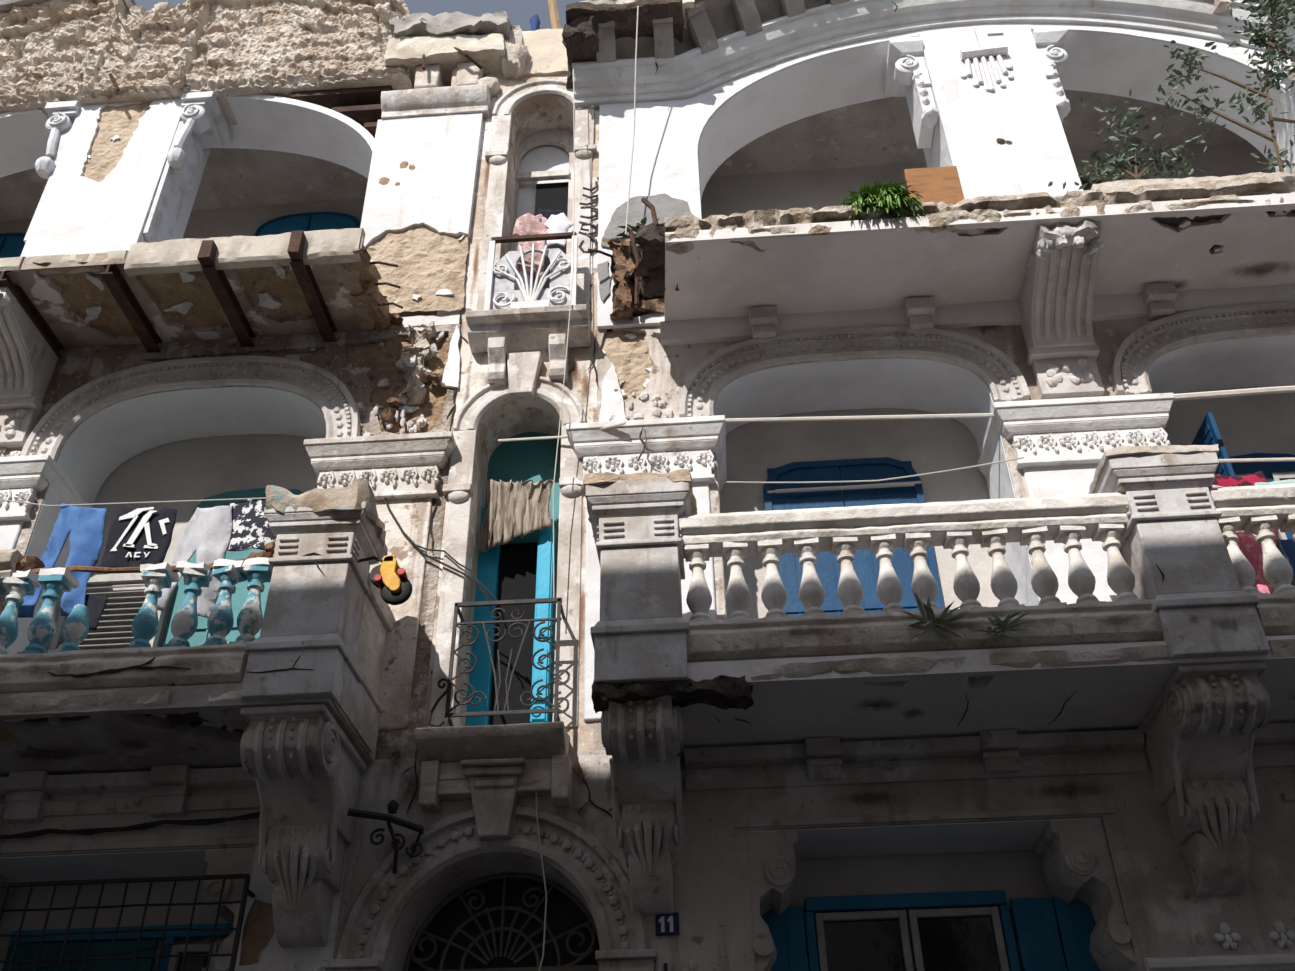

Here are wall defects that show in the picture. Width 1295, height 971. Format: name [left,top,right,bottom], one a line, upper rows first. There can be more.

flaking render [83,73,151,182]
spalling [1154,214,1226,228]
spalling [33,262,137,336]
spalling [137,271,227,328]
spalling [235,266,312,319]
spalling [588,197,679,403]
flaking render [344,225,468,434]
crack [638,425,654,461]
crack [47,657,191,677]
spalling [591,675,754,713]
crack [572,767,613,818]